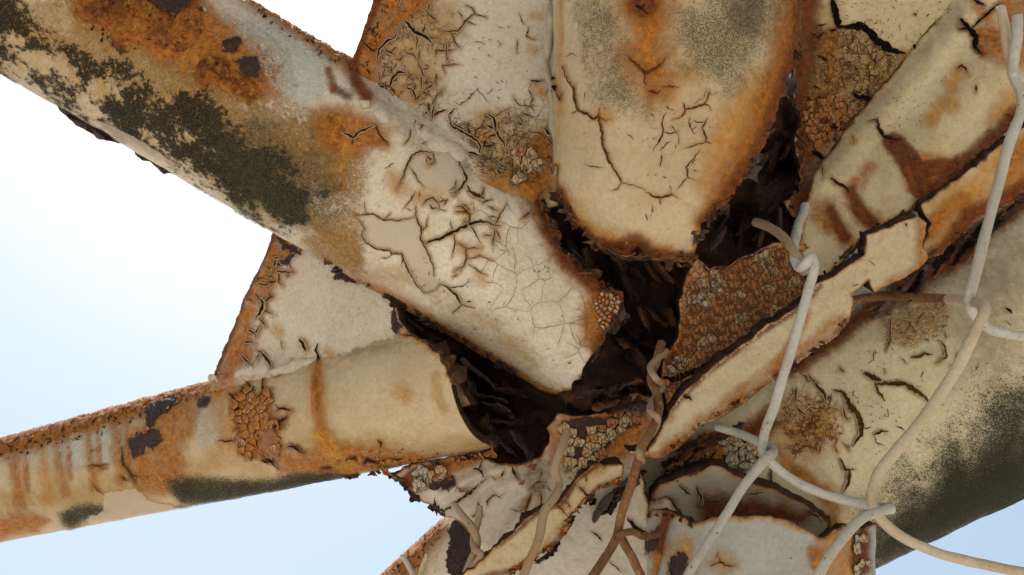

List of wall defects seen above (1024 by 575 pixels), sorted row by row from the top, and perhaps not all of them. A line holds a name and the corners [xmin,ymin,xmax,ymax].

water stain [0,0,368,274]
rust [0,227,373,537]
water stain [215,270,260,374]
crack [214,256,589,574]
peeling [444,520,471,574]
crack [250,0,711,364]
rust [279,0,909,482]
peeling [460,141,806,493]
rust [495,94,1024,548]
crack [781,303,997,494]
crack [802,0,1001,192]
spalling [851,204,1016,320]